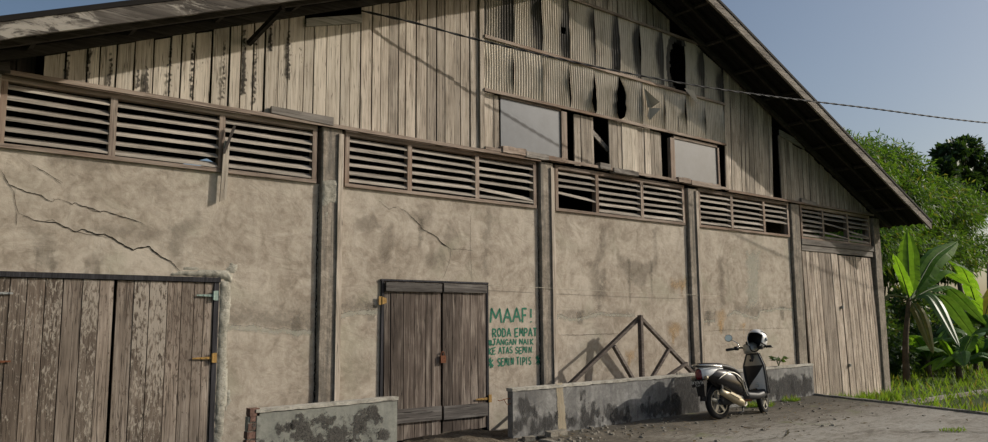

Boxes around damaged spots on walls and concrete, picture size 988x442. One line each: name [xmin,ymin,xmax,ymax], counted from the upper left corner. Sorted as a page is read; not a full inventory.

crack [4,166,180,271]
crack [379,201,472,279]